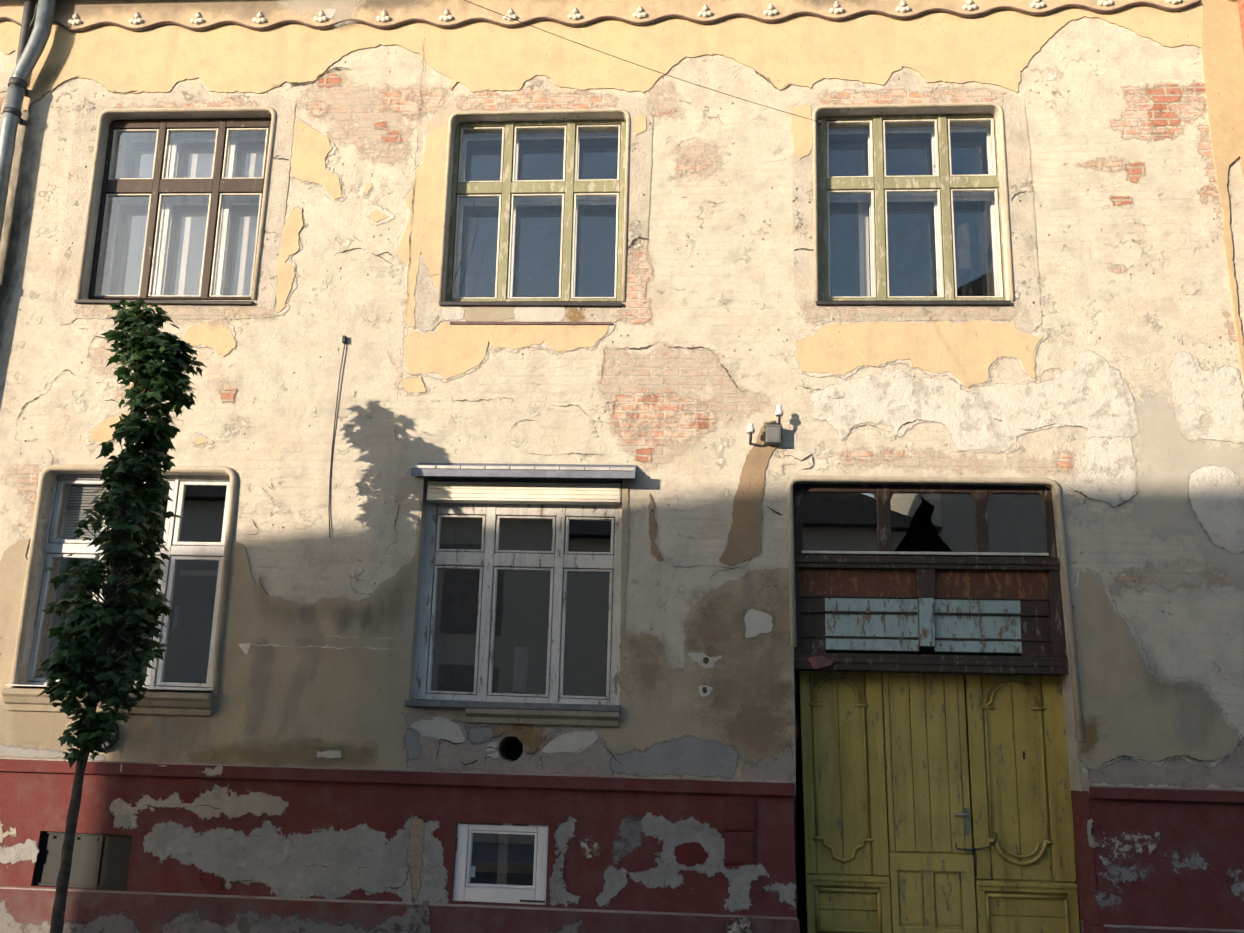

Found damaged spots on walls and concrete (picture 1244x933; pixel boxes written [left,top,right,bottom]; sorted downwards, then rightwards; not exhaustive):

flaking render [1110,81,1207,141]
flaking render [1226,157,1244,345]
peeling [441,306,566,322]
flaking render [860,305,923,321]
flaking render [945,306,1017,319]
peeling [1169,352,1244,444]
peeling [1062,436,1138,507]
spalling [404,707,613,776]
spalling [1088,737,1244,789]
peeling [0,821,39,868]
peeling [109,765,449,933]
peeling [548,812,797,933]